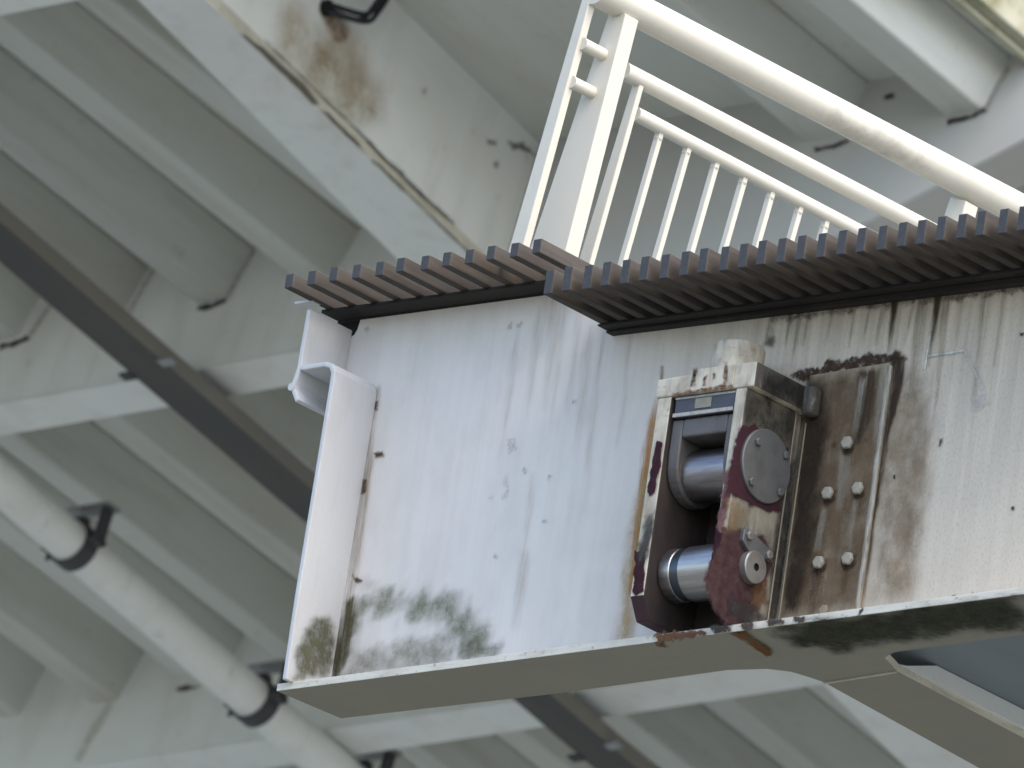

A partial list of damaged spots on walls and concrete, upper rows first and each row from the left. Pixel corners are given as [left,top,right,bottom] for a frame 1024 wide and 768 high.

rust [674,364,733,396]
rust [785,350,907,611]
rust [622,412,657,637]
water stain [333,597,354,677]
rust [731,632,772,656]